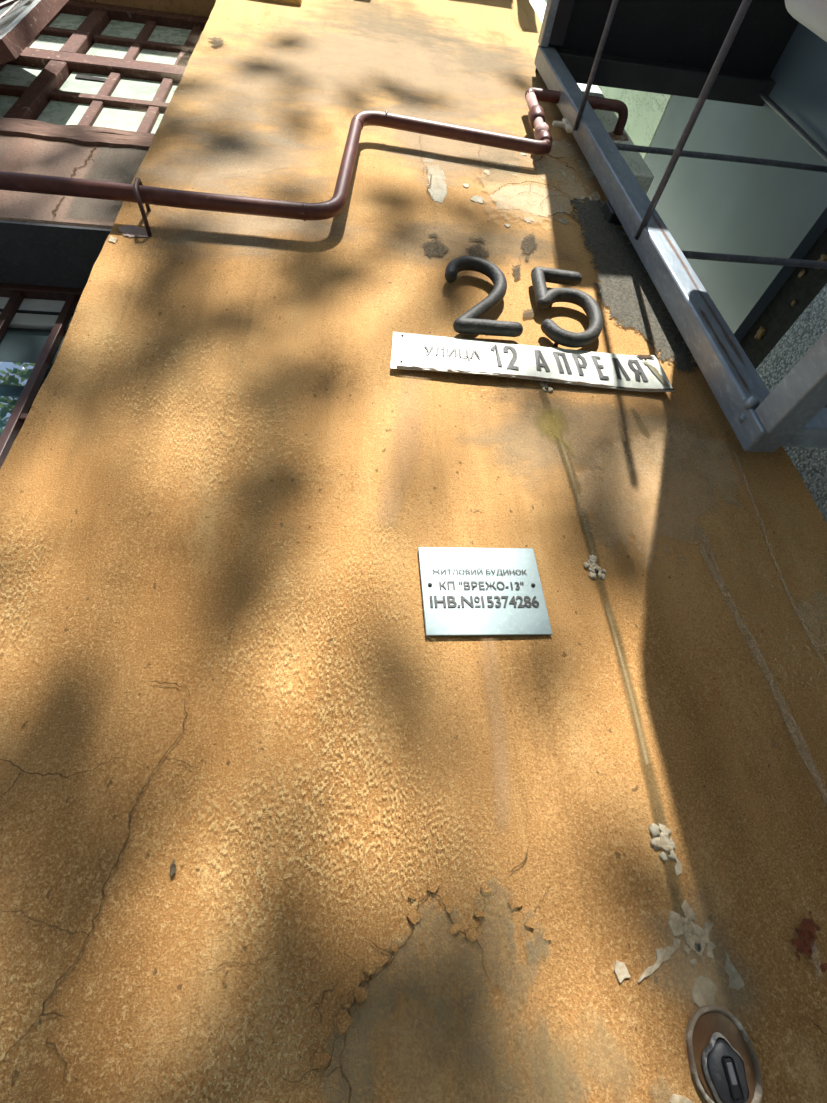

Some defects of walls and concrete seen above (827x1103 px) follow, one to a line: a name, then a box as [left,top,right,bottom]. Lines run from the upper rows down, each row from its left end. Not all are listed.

leakage [70,197,123,220]
leakage [87,134,305,194]
flaking render [425,155,447,204]
leakage [391,130,517,174]
flaking render [463,140,605,228]
leakage [501,389,673,833]
crack [0,681,197,1081]
peeling [219,798,469,917]
peeling [182,881,553,1103]
peeling [614,900,745,1007]
leakage [662,848,741,1007]
corrosion [791,911,827,972]